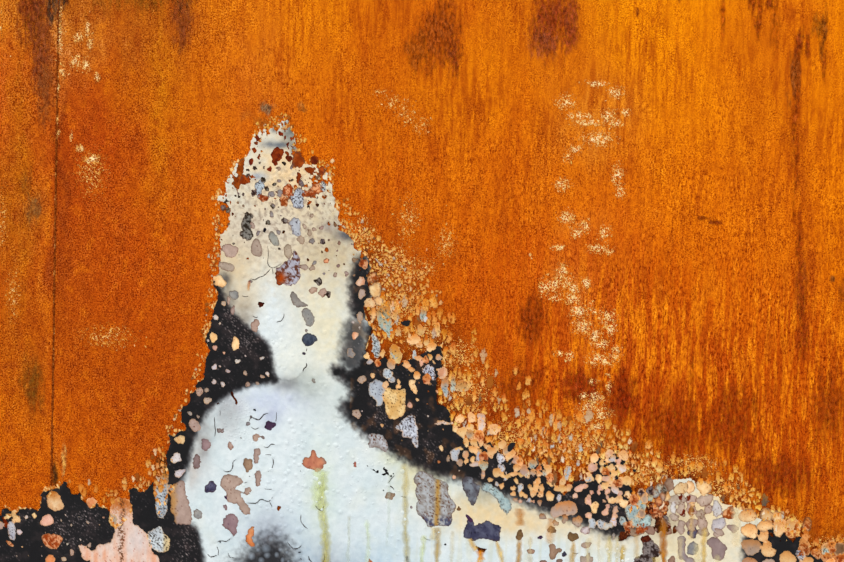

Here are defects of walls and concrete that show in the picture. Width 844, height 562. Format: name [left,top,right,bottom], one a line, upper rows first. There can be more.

peeling [56,7,101,91]
rust [405,0,461,75]
rust [533,0,578,52]
rust [748,0,778,37]
peeling [56,115,111,202]
peeling [366,86,435,136]
peeling [553,79,631,197]
rust [790,15,827,188]
peeling [71,321,147,351]
rust [500,371,541,400]
rust [563,368,636,420]
peeling [0,364,238,562]